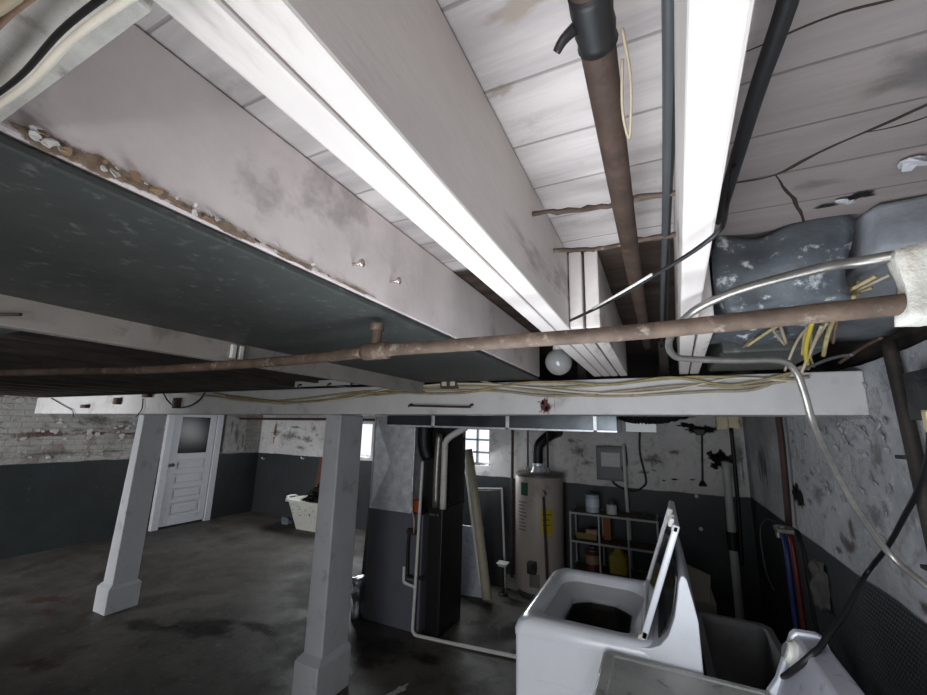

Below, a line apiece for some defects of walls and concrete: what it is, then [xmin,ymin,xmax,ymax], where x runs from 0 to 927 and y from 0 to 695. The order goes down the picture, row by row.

peeling [9,121,375,298]
crack [736,103,927,222]
peeling [897,155,927,172]